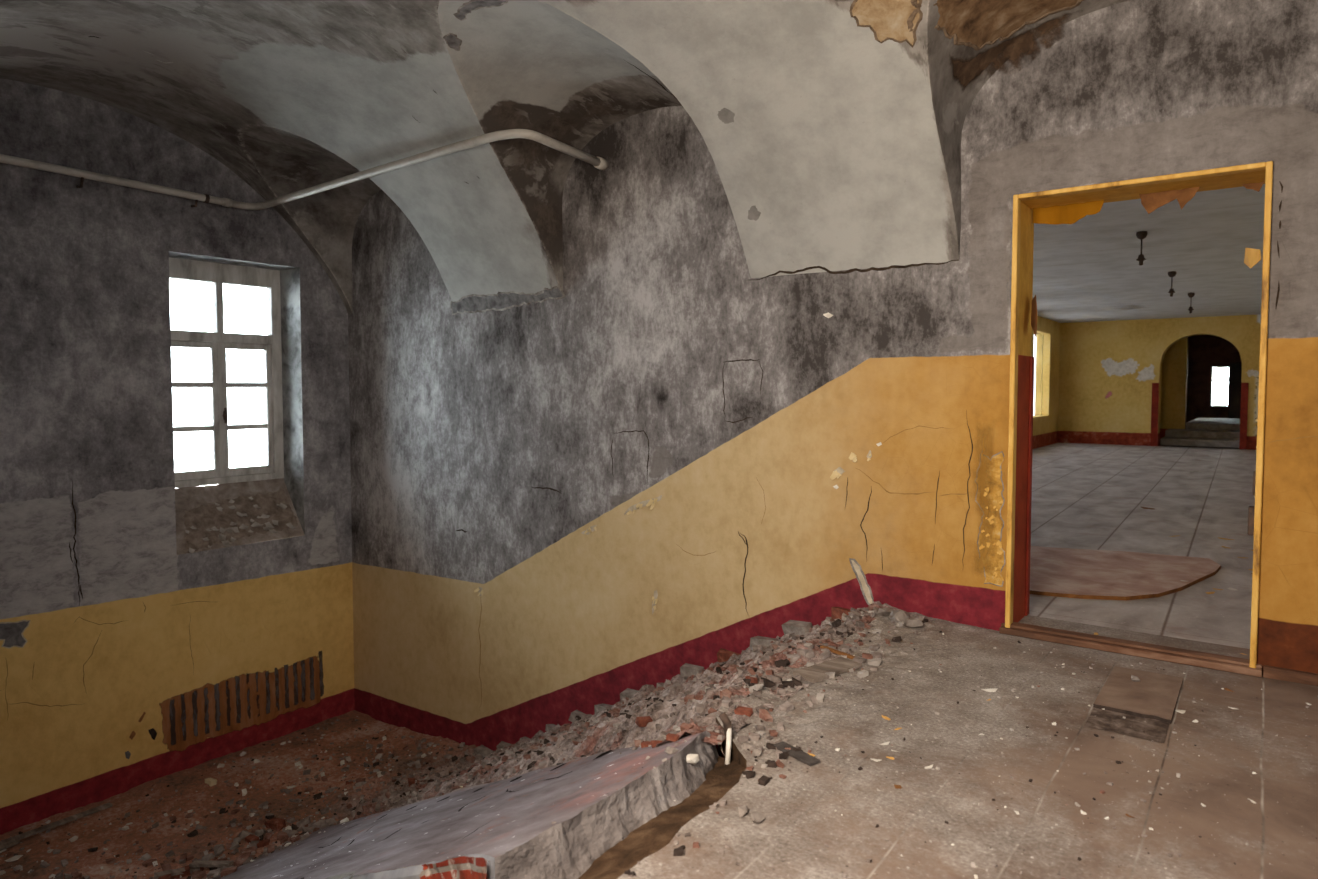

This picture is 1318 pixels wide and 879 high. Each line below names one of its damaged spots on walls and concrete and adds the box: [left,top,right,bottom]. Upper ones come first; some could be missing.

flaking render [849,0,1084,51]
peeling [1244,248,1261,268]
peeling [0,620,30,649]
crack [3,481,208,720]
crack [675,481,766,616]
crack [845,410,973,570]